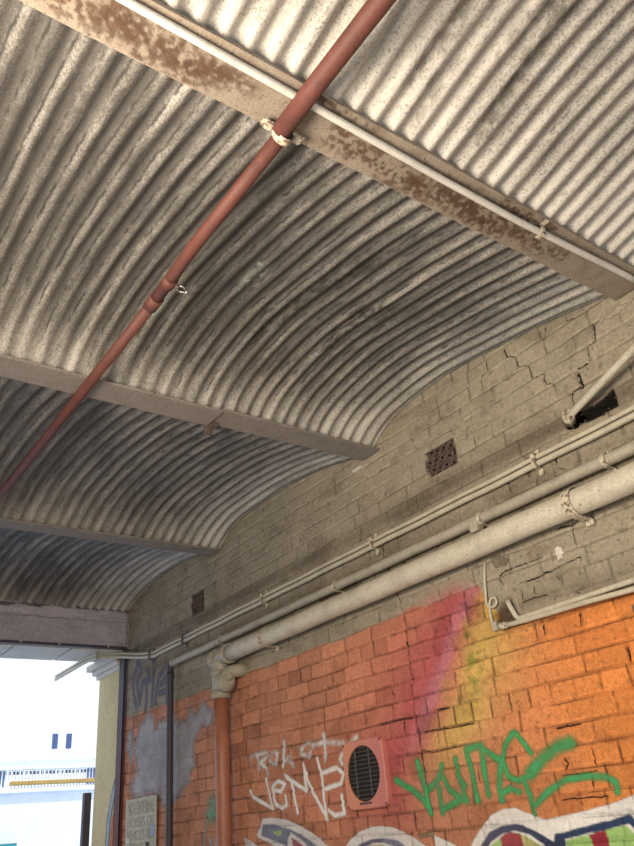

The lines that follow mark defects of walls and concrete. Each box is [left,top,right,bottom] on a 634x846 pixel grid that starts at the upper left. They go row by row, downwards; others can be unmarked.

rust [57,0,245,85]
rust [329,126,566,256]
crack [481,321,598,426]
spalling [566,389,618,430]
crack [499,521,581,603]
crack [381,592,475,828]